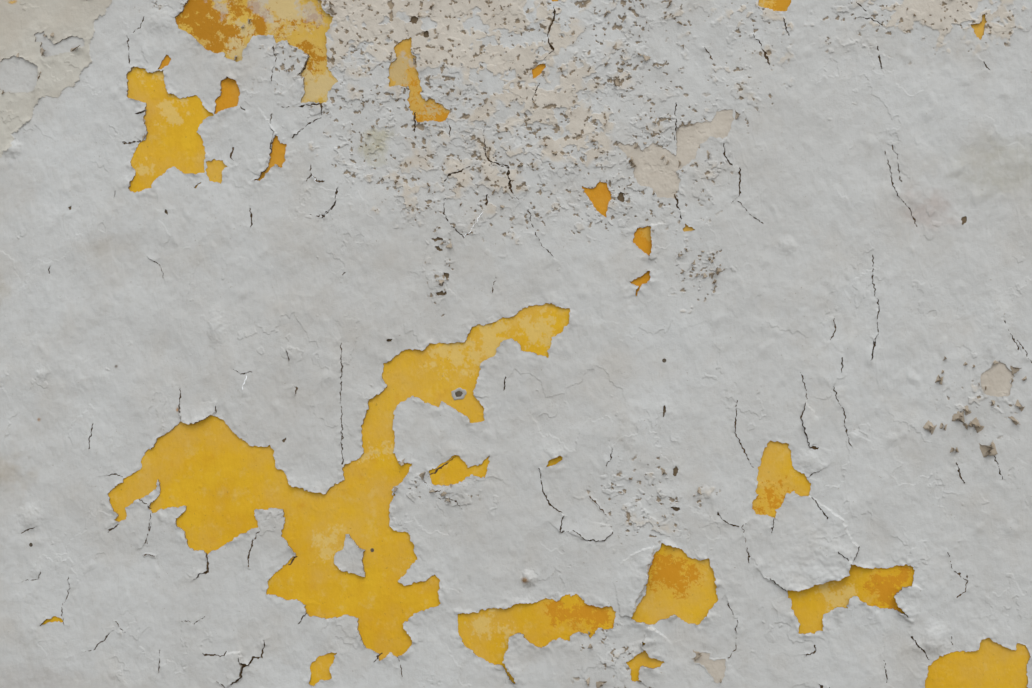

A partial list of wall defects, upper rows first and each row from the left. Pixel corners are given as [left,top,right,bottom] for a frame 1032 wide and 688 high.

peeling [0,0,113,157]
peeling [126,54,240,193]
peeling [166,0,740,299]
peeling [758,0,791,11]
crack [885,145,917,227]
peeling [837,0,1026,54]
peeling [108,303,570,661]
crack [538,468,613,542]
peeling [457,460,718,688]
peeling [745,440,927,635]
spalling [212,640,265,688]
peeling [925,638,1031,688]